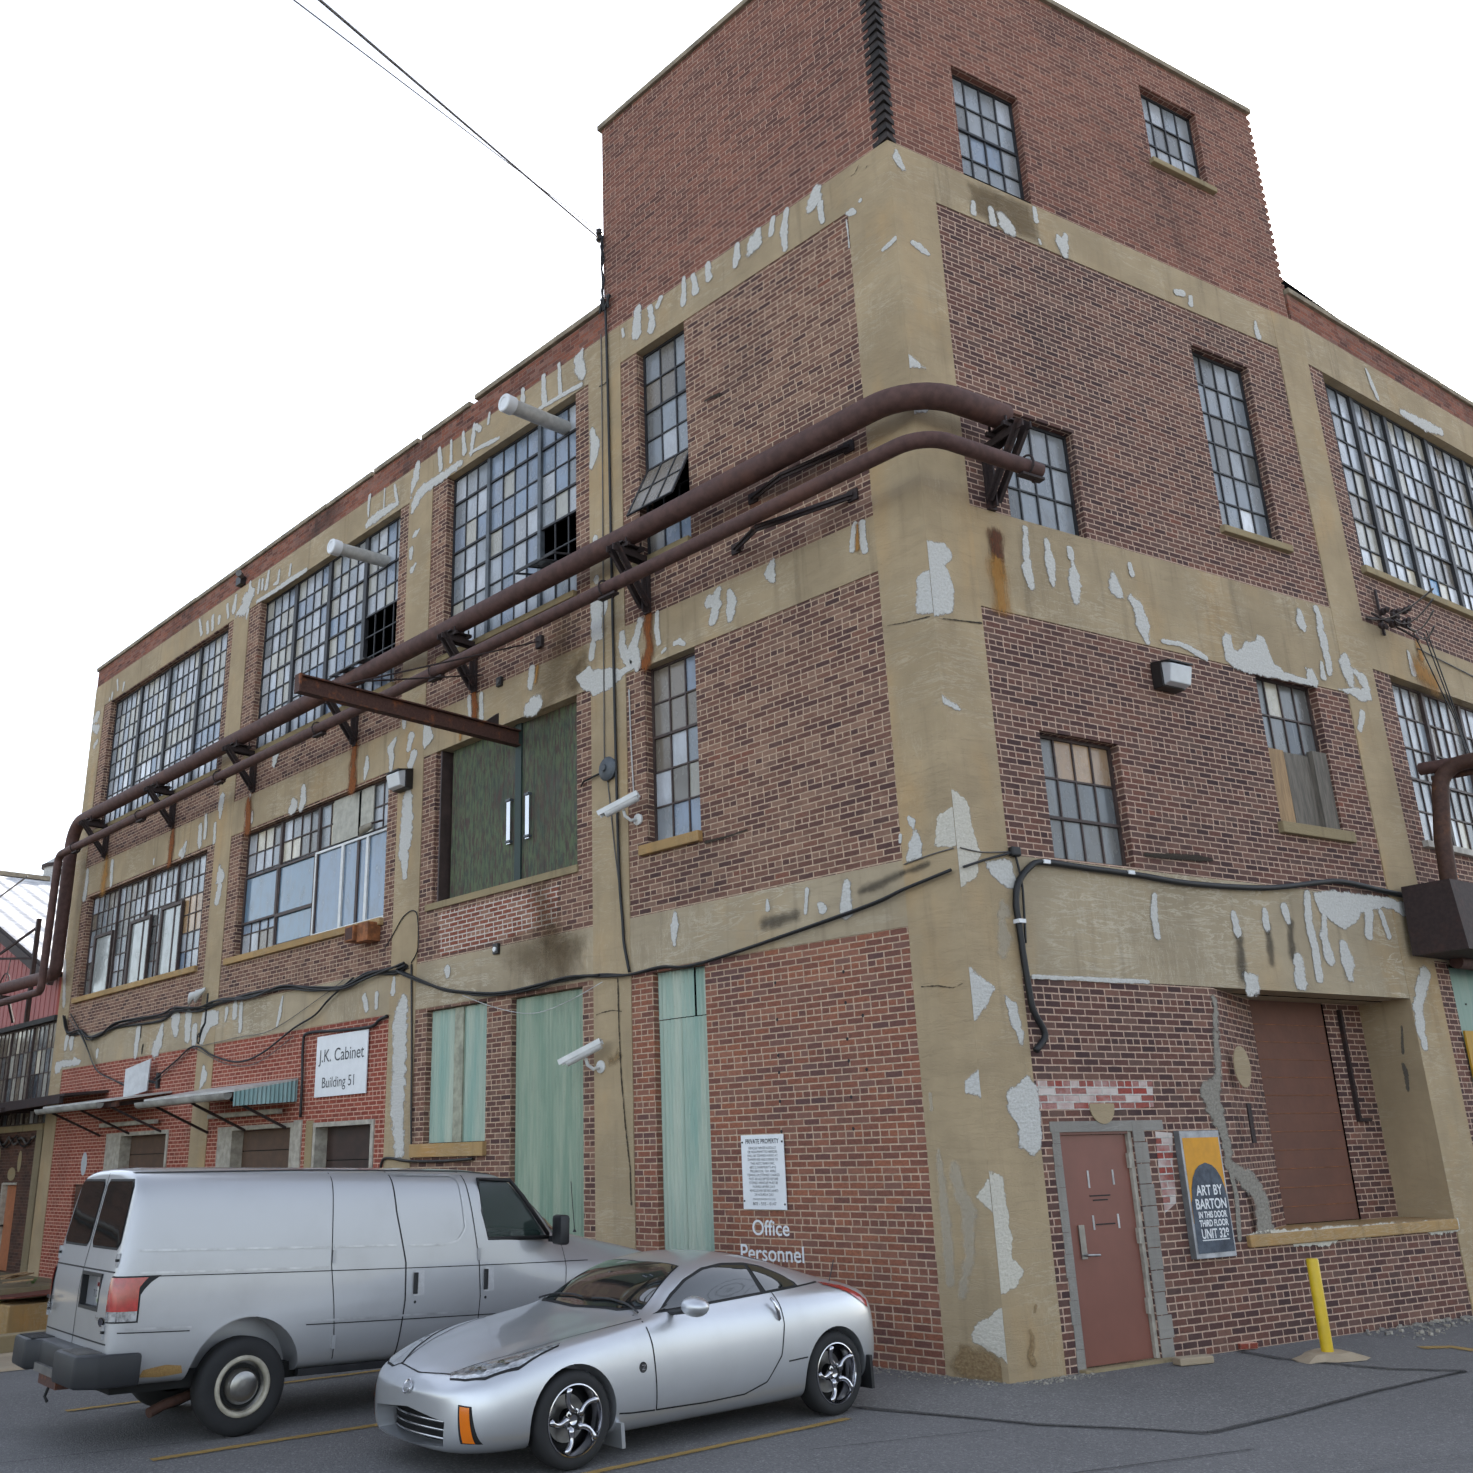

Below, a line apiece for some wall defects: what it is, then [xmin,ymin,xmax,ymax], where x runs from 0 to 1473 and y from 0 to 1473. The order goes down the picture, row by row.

peeling [733,184,825,268]
peeling [970,200,1016,237]
peeling [365,412,500,574]
peeling [915,540,954,616]
corrosion [987,528,1009,613]
peeling [1021,525,1082,605]
peeling [576,575,686,696]
peeling [1108,562,1372,732]
peeling [1262,890,1406,990]
peeling [362,976,409,1162]
peeling [1006,1075,1154,1156]
peeling [953,1171,1024,1381]